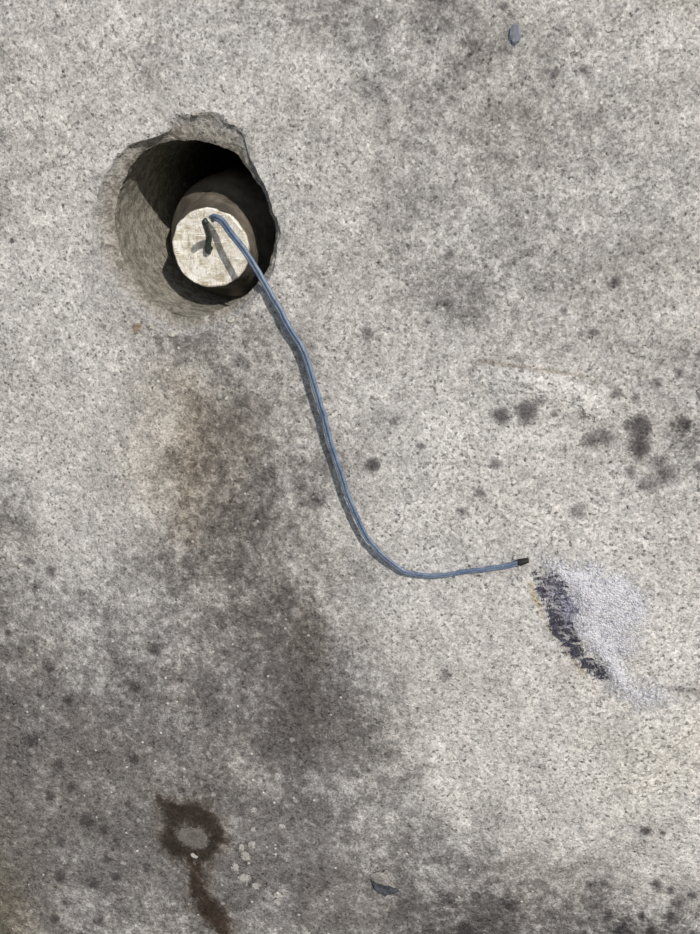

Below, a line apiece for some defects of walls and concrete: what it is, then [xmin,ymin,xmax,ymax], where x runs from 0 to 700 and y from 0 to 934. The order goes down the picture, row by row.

leakage [231,827,260,890]